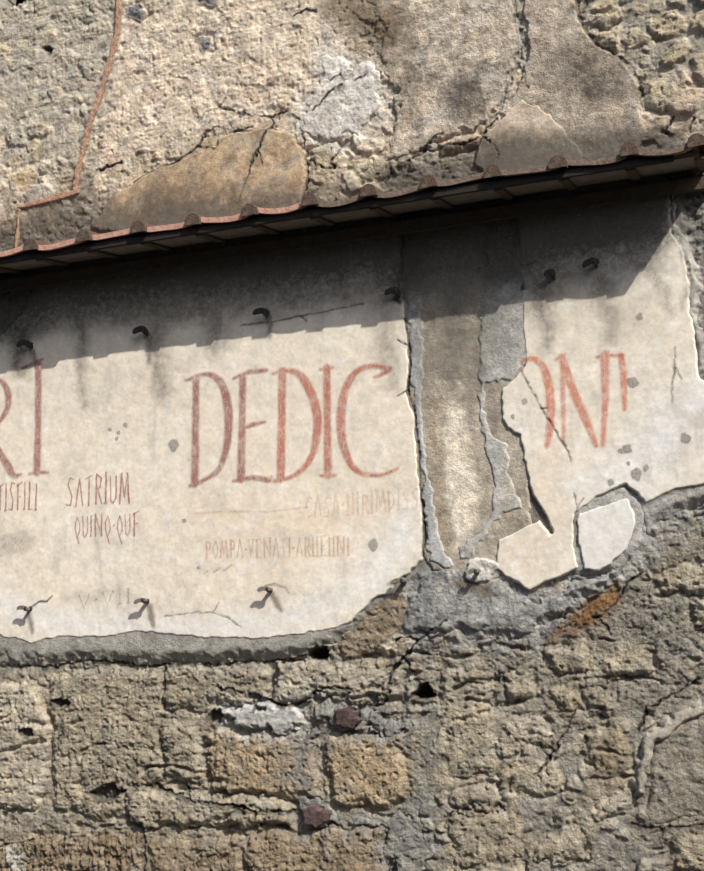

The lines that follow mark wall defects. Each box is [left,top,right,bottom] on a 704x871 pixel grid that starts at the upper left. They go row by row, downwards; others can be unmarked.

crack [96,73,366,196]
crack [384,0,529,184]
damp [384,125,684,192]
crack [575,0,651,105]
damp [0,173,677,280]
damp [0,187,678,372]
damp [680,242,695,296]
crack [521,371,571,461]
peeling [577,479,635,571]
corrosion [573,584,619,625]